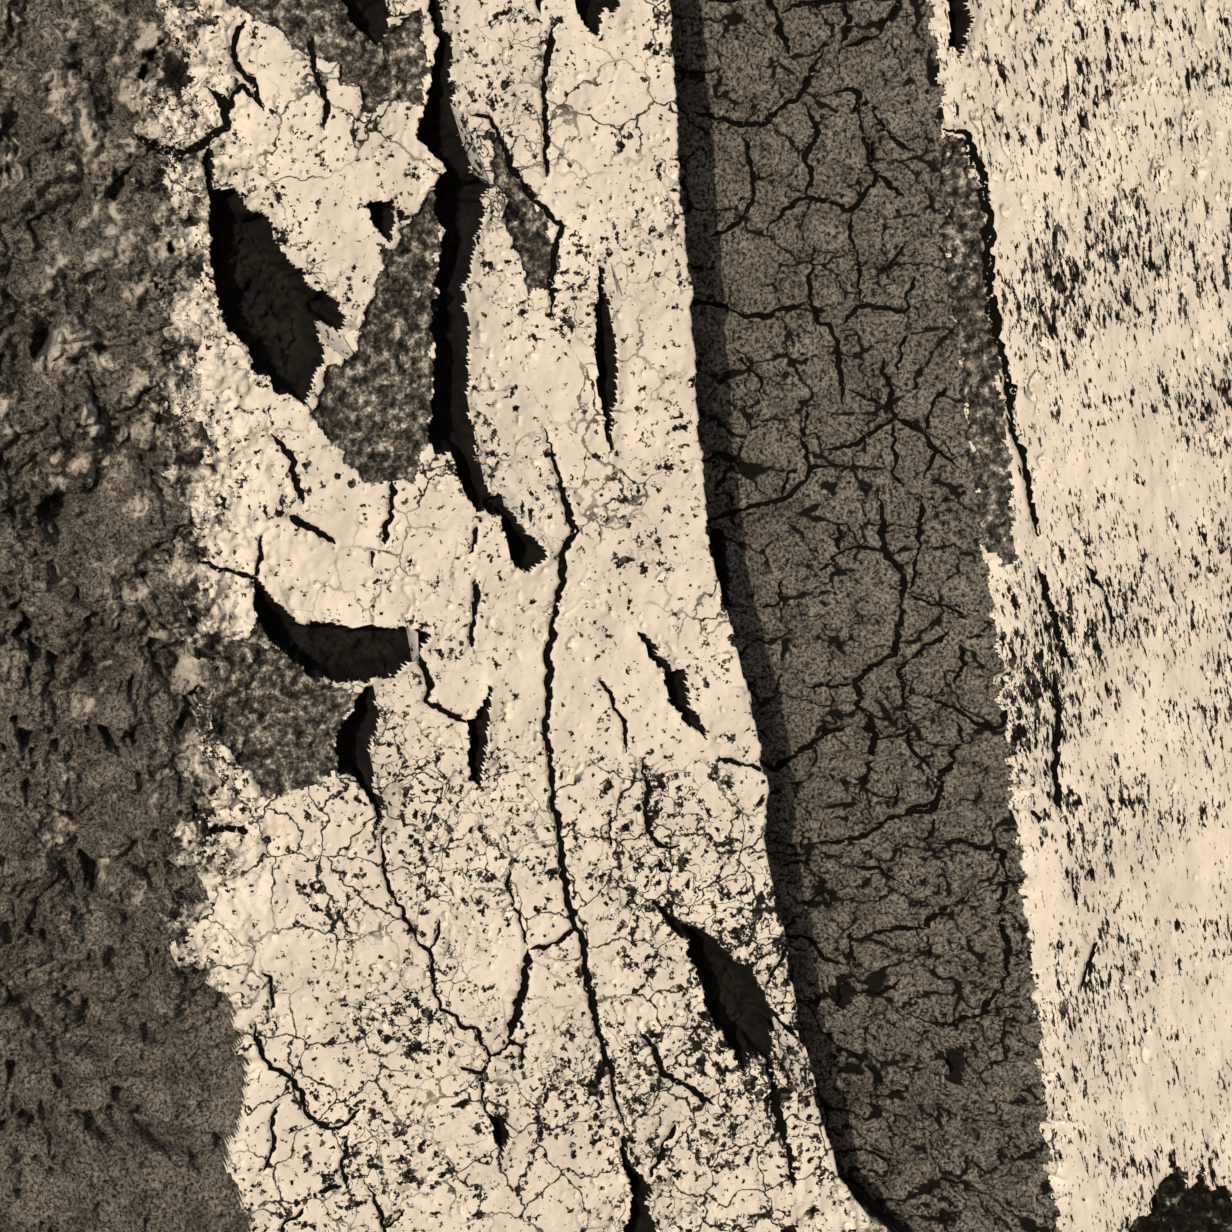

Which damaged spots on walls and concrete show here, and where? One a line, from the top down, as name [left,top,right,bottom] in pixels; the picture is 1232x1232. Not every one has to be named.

crack [134,19,264,157]
peeling [130,0,561,572]
crack [469,0,565,321]
spalling [593,260,619,453]
crack [690,0,1013,1028]
crack [942,128,1039,536]
peeling [155,530,431,987]
spalling [467,686,493,785]
crack [380,428,628,1131]
crack [253,971,405,1232]
spalling [652,901,816,1103]
spalling [1128,1166,1232,1232]